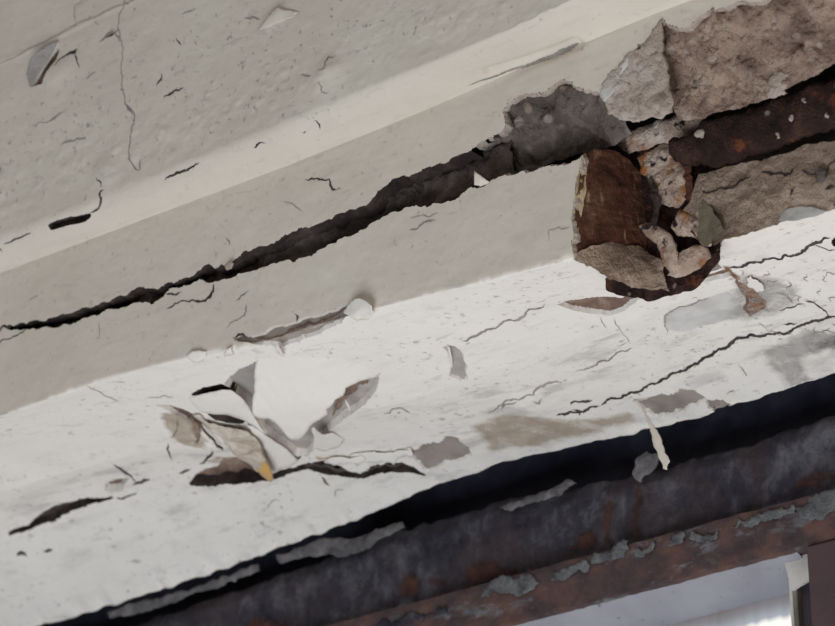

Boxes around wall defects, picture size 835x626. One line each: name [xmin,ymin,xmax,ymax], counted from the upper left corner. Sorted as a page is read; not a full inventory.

crack [0,0,141,170]
spalling [471,0,835,264]
crack [48,140,516,337]
peeling [164,298,471,485]
crack [463,304,545,342]
flaking render [565,296,633,311]
corrosion [571,149,670,292]
crack [489,237,835,416]
peeling [664,292,745,332]
corrosion [725,267,766,316]
crack [35,498,81,519]
corrosion [467,562,518,583]